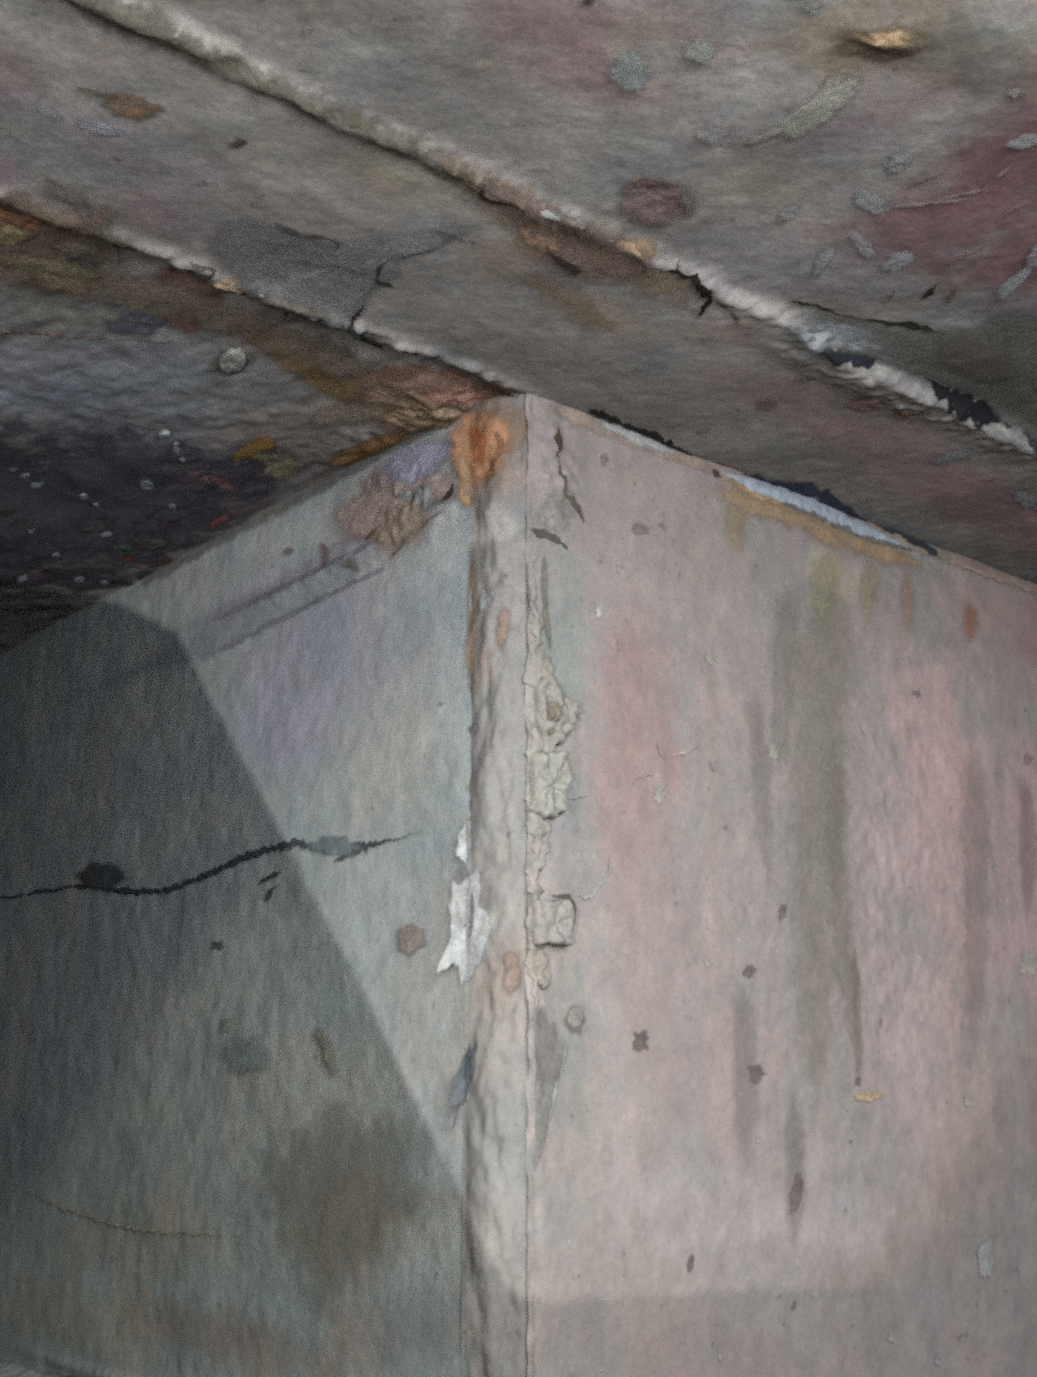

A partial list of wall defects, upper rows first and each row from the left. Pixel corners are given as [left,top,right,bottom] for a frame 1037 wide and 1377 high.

rust [75,87,163,121]
rust [835,24,931,60]
peeling [211,218,466,351]
crack [651,258,741,326]
rust [0,178,515,584]
crack [789,283,1037,458]
crack [0,831,420,902]
peeling [437,818,491,985]